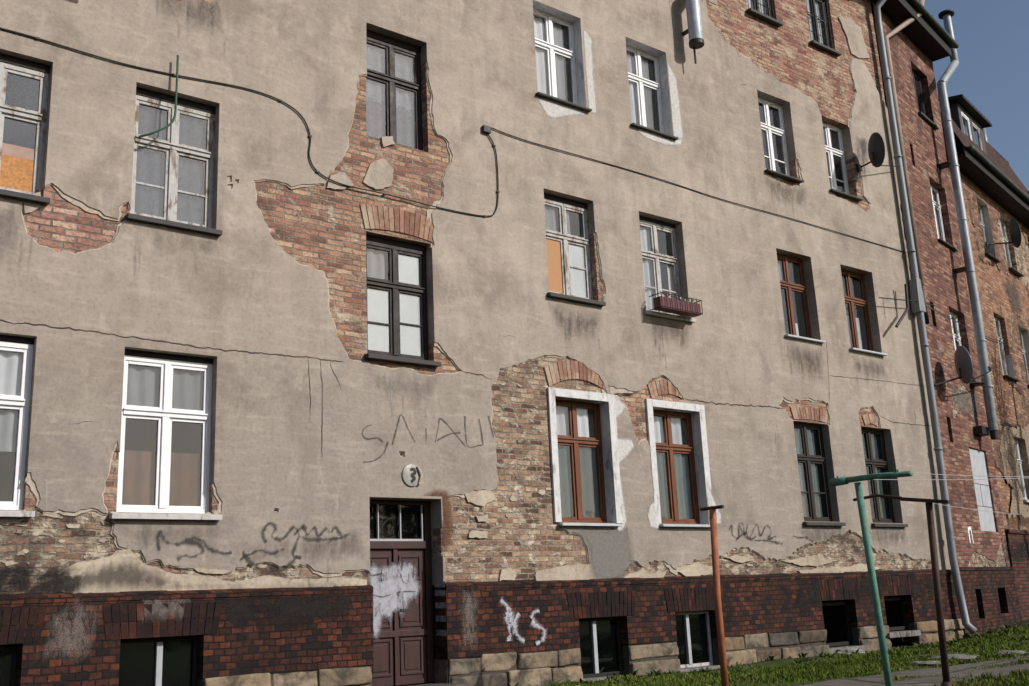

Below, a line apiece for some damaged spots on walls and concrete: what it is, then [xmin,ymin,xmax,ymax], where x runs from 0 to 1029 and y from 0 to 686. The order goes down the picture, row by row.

flaking render [706,0,885,131]
flaking render [21,183,131,255]
flaking render [254,61,462,376]
crack [0,319,345,452]
flaking render [0,441,370,594]
flaking render [431,355,684,582]
flaking render [617,530,932,578]